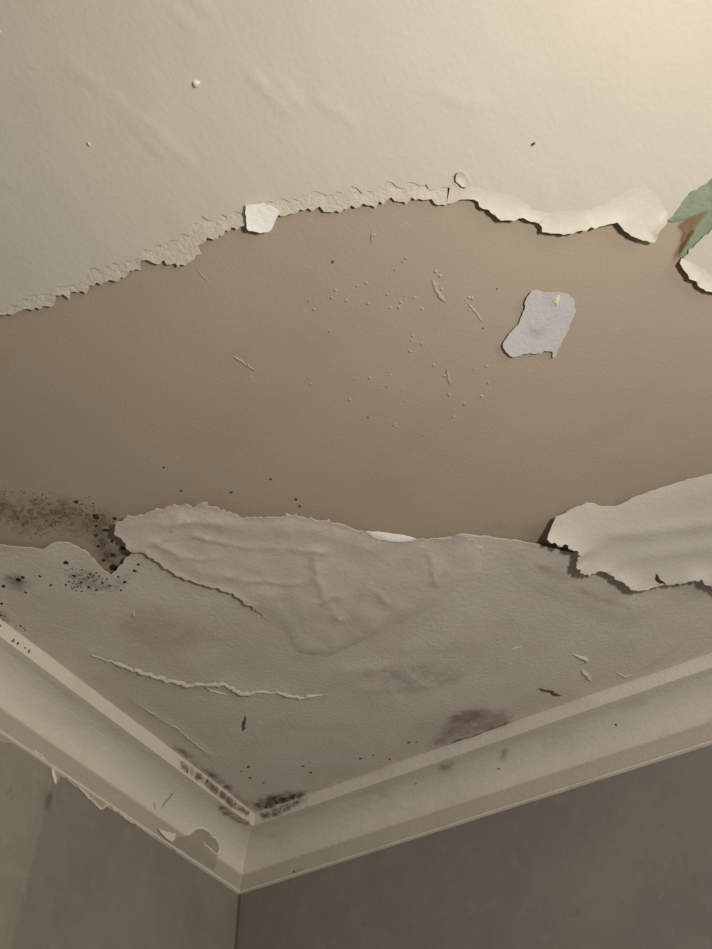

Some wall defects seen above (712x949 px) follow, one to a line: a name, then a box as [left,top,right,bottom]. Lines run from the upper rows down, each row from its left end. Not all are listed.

peeling [0,172,712,591]
damp [3,490,127,592]
damp [182,766,301,824]